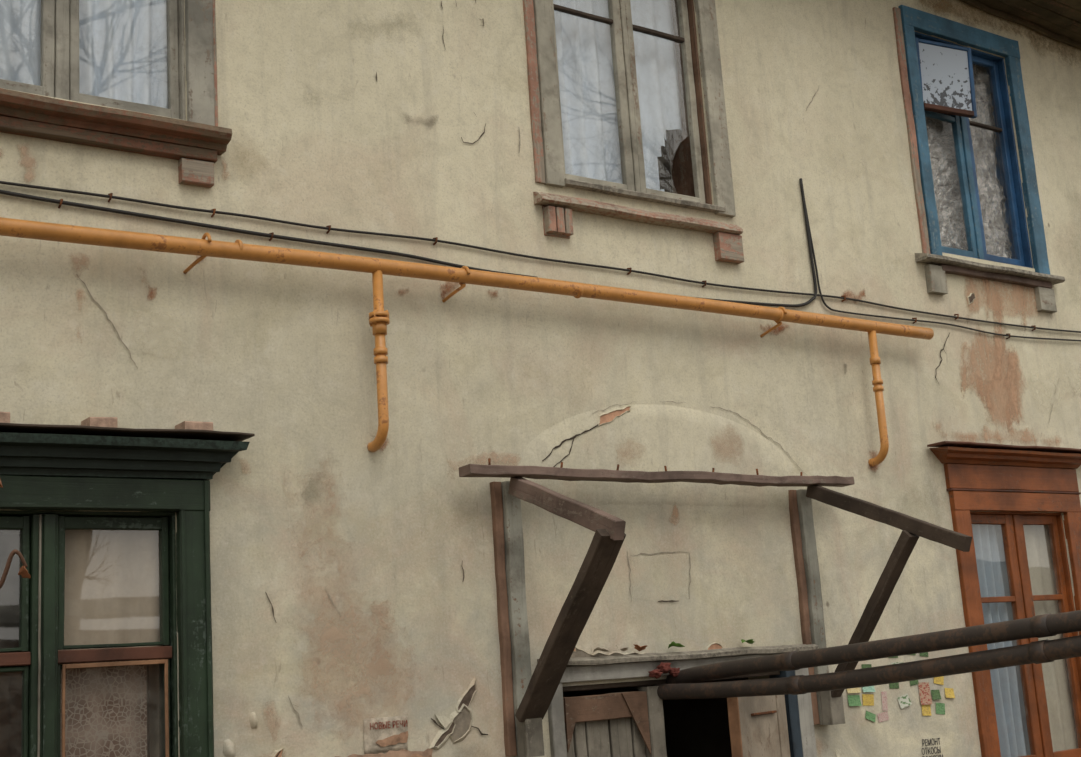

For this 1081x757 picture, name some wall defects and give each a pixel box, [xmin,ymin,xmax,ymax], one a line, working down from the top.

crack [76,274,138,369]
crack [542,402,632,467]